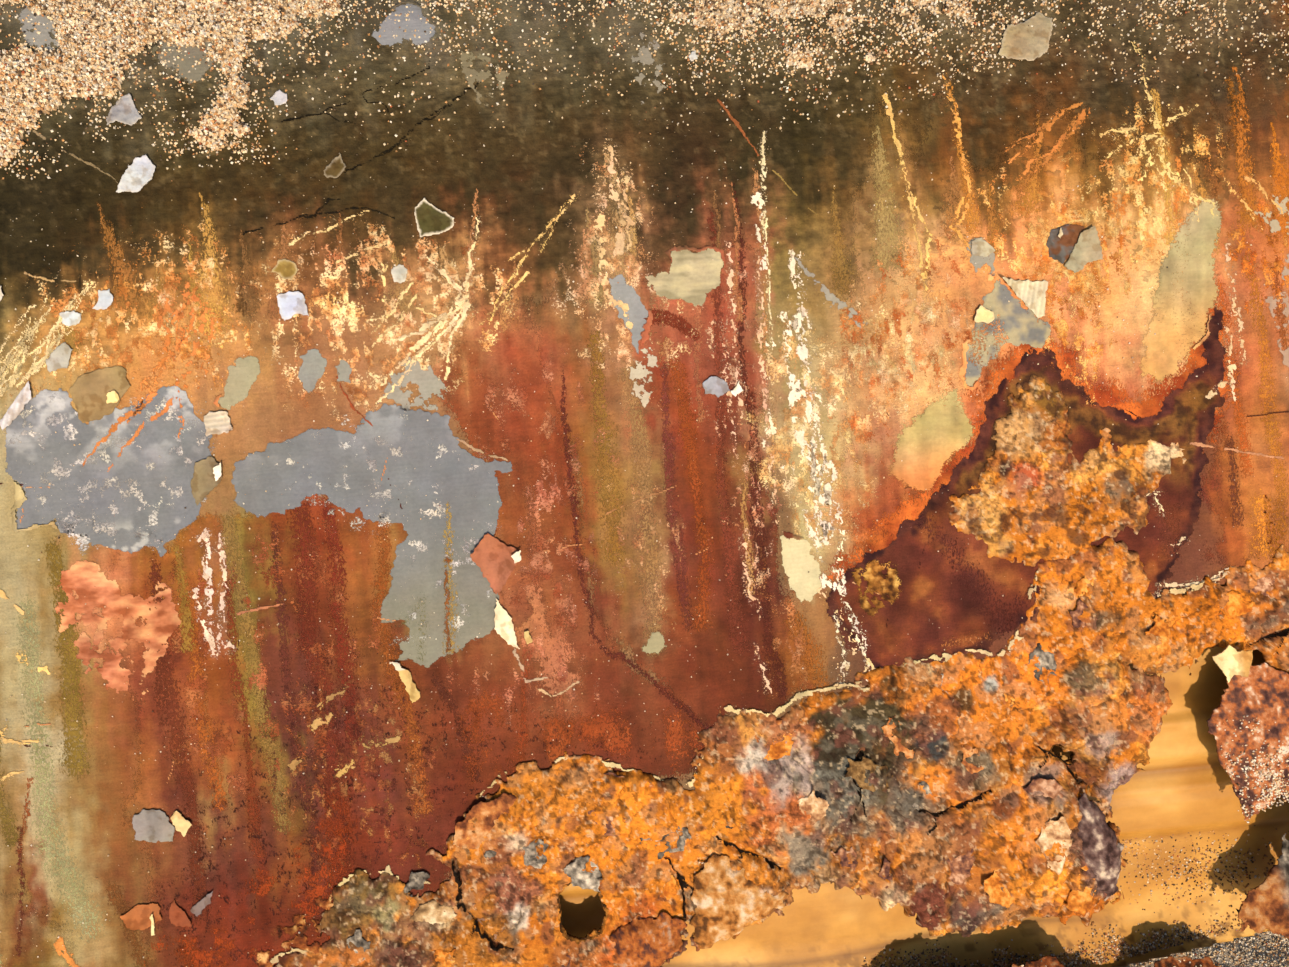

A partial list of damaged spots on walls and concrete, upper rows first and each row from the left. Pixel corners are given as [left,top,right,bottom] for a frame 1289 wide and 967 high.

water stain [0,721,39,747]
corrosion [0,536,133,967]
peeling [132,809,192,843]
peeling [0,342,533,703]
water stain [137,511,455,881]
crack [452,862,514,951]
corrosion [97,182,1127,967]
water stain [0,42,1289,740]
crack [716,836,783,870]
crack [916,789,992,835]
peeling [886,237,1051,493]
corrosion [825,60,1289,819]